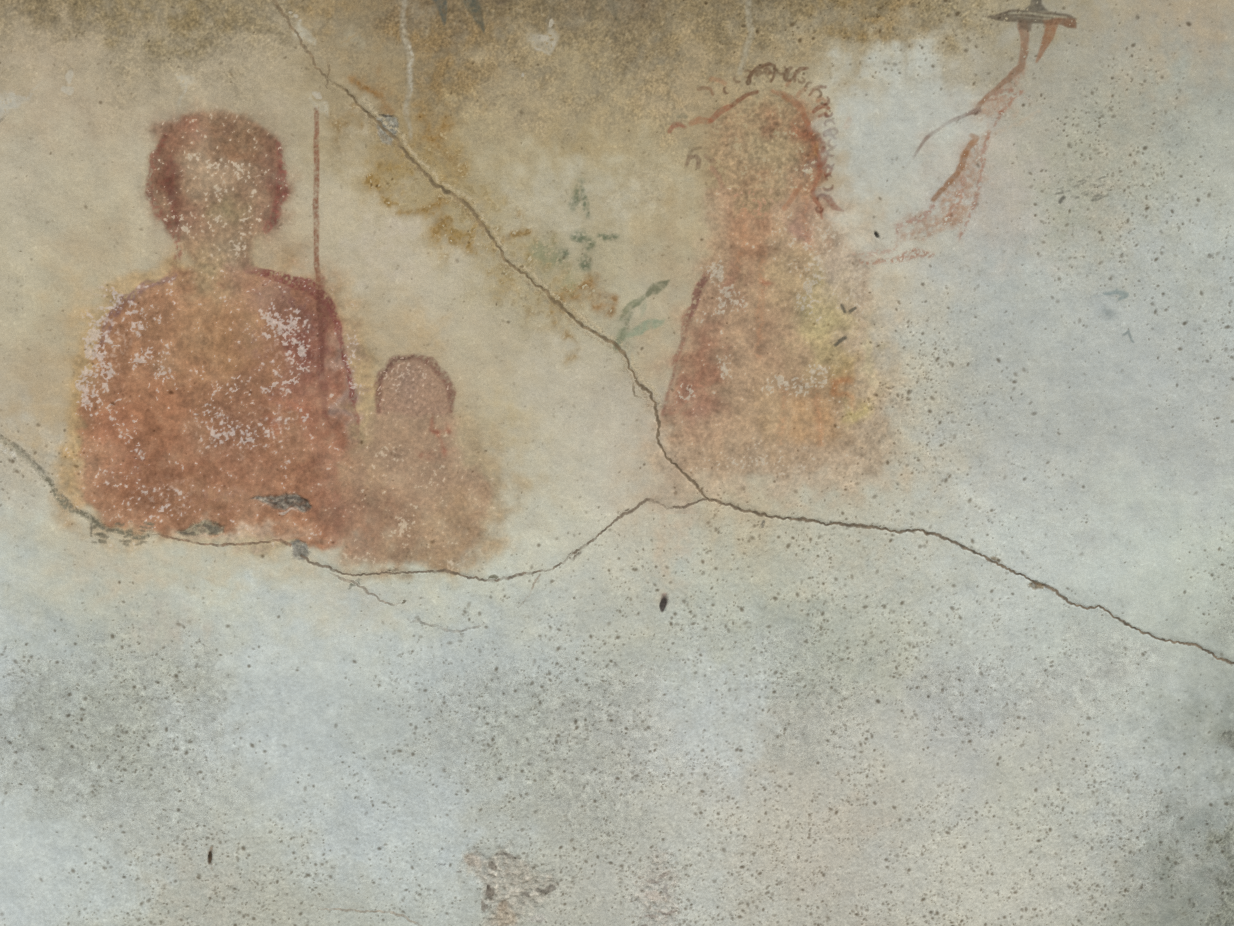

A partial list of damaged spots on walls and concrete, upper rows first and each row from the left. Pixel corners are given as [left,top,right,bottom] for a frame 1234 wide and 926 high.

crack [0,0,1234,665]